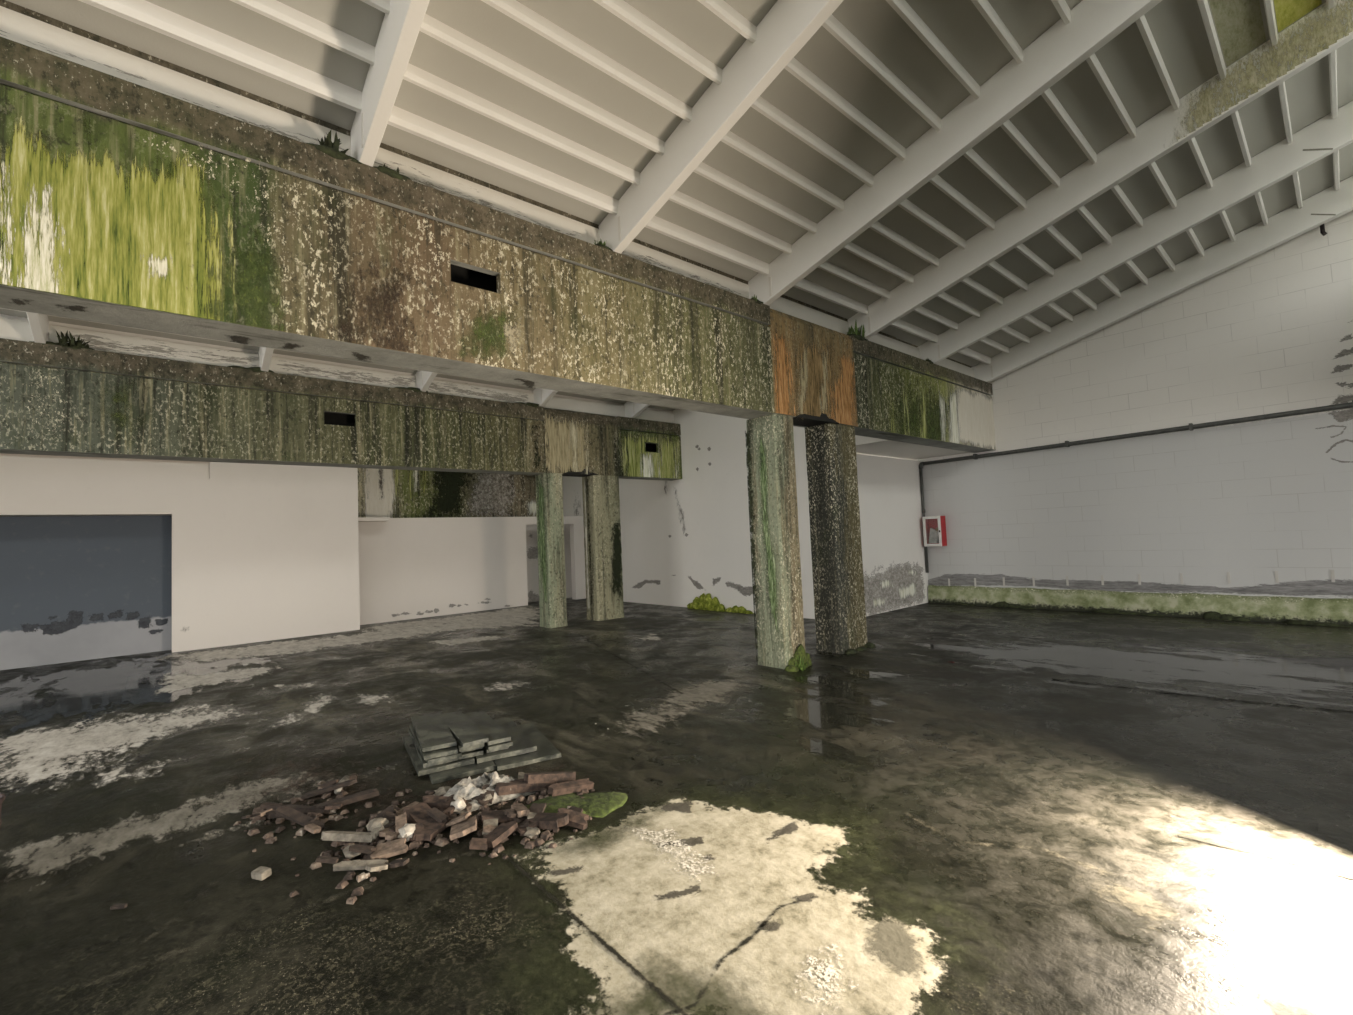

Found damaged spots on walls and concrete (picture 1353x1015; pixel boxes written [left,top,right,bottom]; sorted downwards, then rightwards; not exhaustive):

leakage [0,162,70,293]
leakage [148,255,168,279]
leakage [139,136,289,257]
leakage [504,320,524,352]
rust [773,331,856,425]
peeling [1326,321,1353,422]
peeling [21,609,168,635]
peeling [633,575,753,596]
peeling [863,562,1353,616]
crack [494,846,818,1015]
leakage [514,795,959,1015]